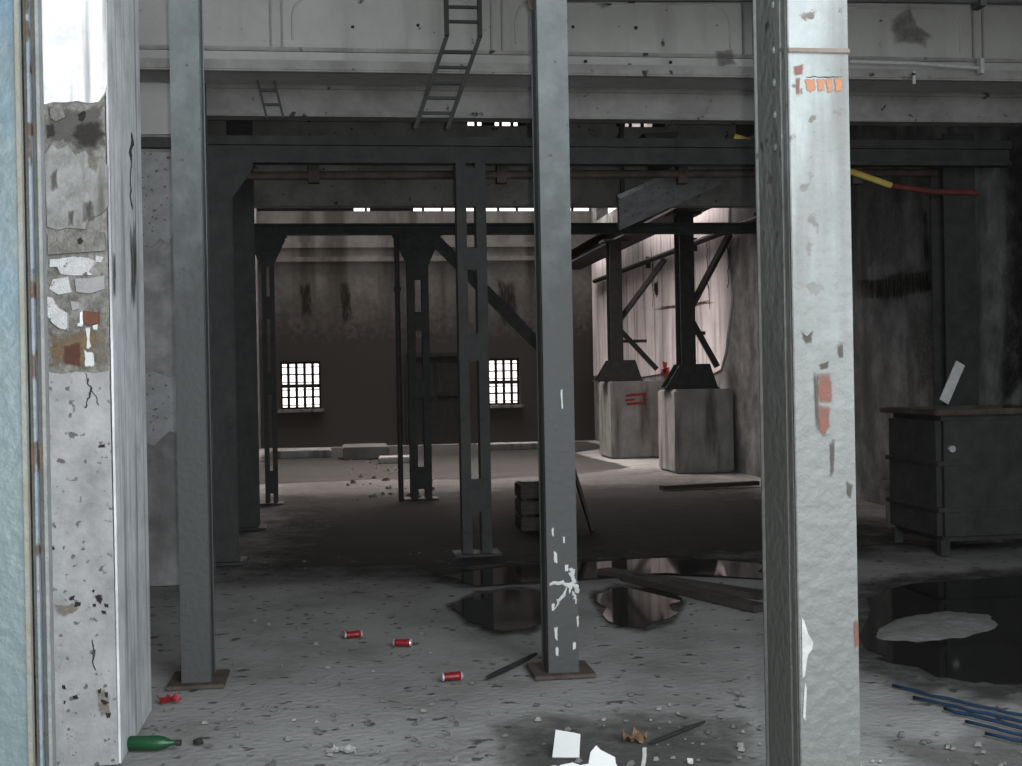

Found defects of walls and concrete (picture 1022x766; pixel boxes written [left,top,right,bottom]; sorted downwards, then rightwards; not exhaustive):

spalling [47,107,105,149]
peeling [47,256,106,331]